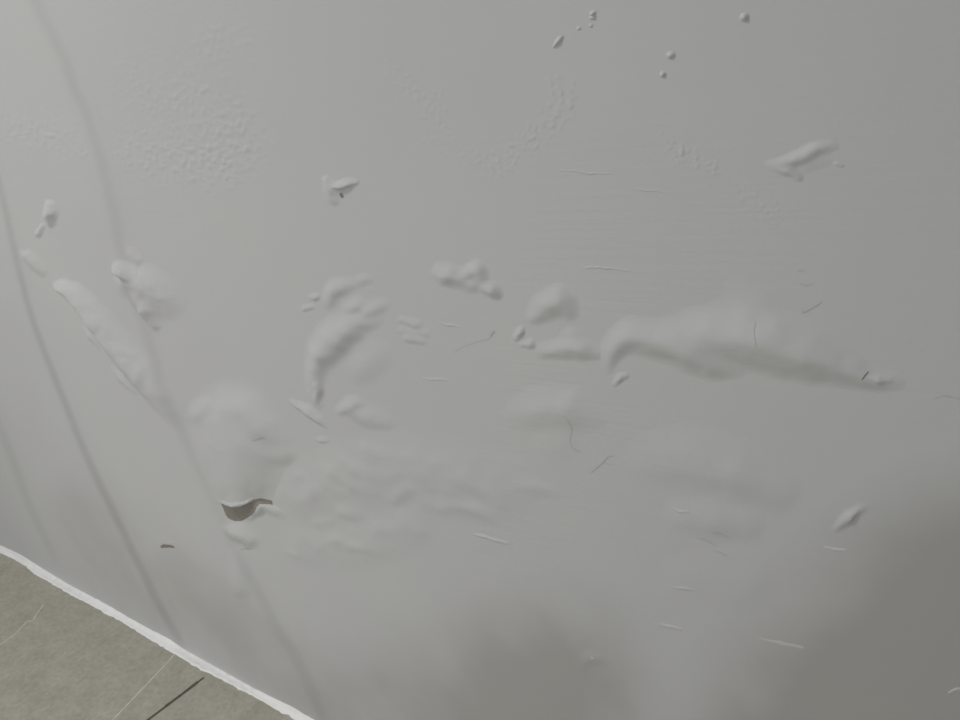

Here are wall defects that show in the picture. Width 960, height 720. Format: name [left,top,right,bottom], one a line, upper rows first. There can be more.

peeling [186,377,331,522]